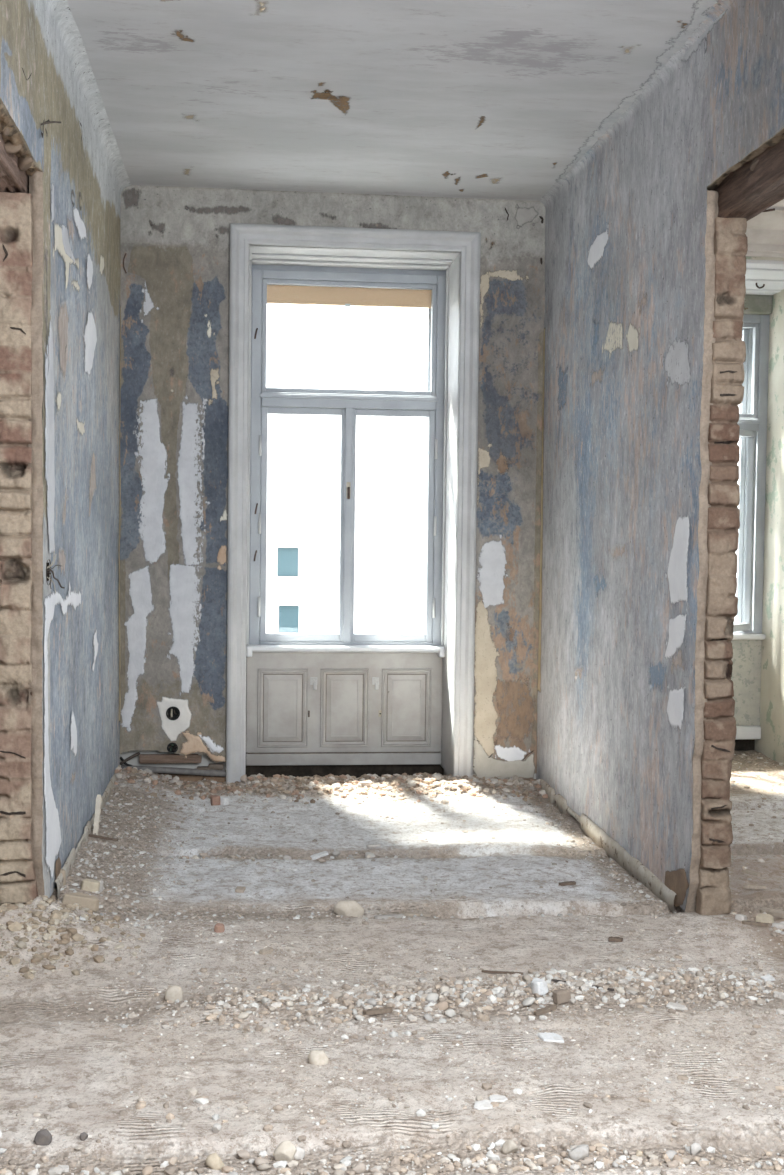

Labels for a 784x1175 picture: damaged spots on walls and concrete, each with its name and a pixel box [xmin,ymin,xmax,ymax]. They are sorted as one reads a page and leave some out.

spalling [0,98,53,176]
peeling [311,83,350,113]
peeling [202,368,220,405]
peeling [477,443,511,505]
spalling [0,192,104,906]
spalling [217,545,227,570]
spalling [665,217,748,915]
spalling [473,600,535,779]